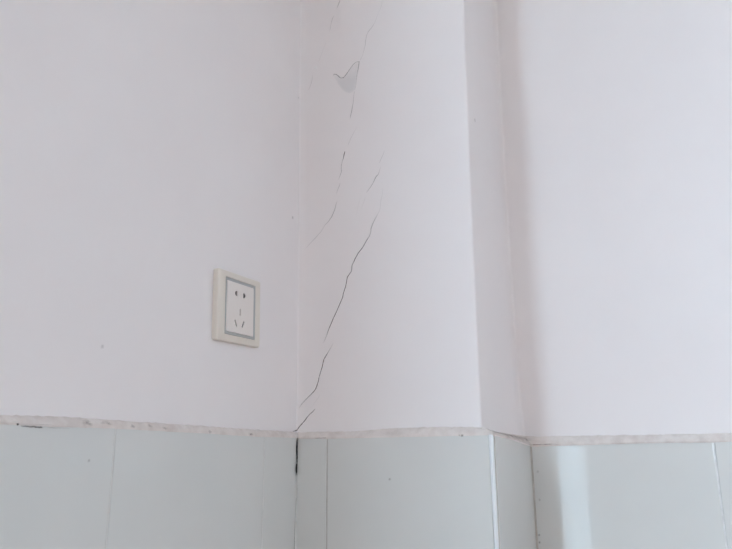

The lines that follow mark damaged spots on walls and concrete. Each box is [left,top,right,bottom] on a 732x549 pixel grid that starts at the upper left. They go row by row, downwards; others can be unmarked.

crack [295,214,377,431]